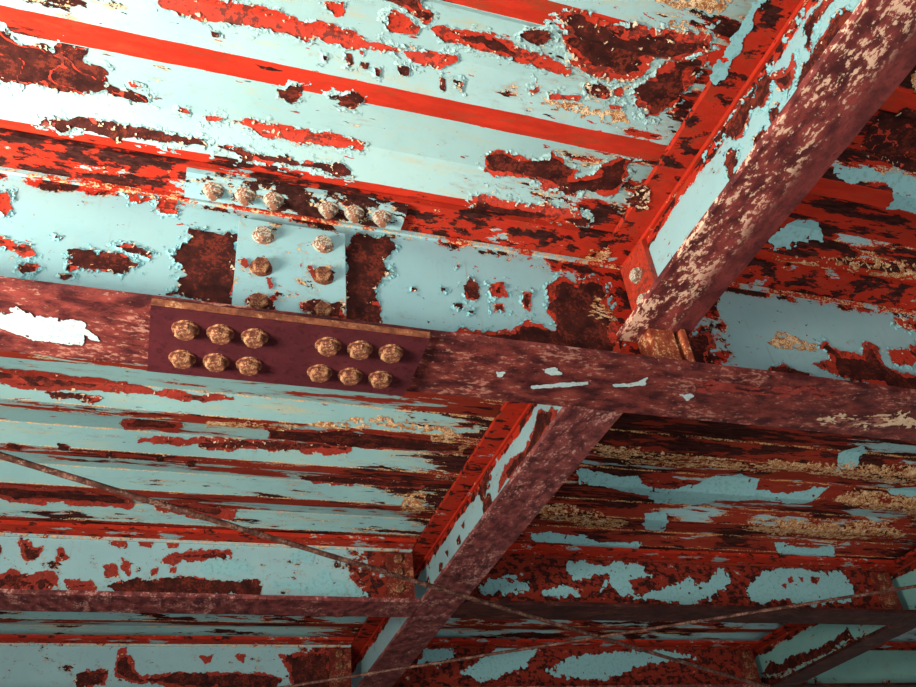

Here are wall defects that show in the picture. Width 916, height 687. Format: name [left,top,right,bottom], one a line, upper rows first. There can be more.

rust [0,21,354,185]
peeling [151,0,769,130]
rust [702,102,784,181]
rust [791,0,861,95]
peeling [465,148,642,228]
peeling [0,307,100,346]
rust [9,222,238,305]
rust [299,230,402,323]
peeling [441,271,626,353]
peeling [118,418,463,458]
rust [107,575,263,595]
peeling [73,647,335,687]